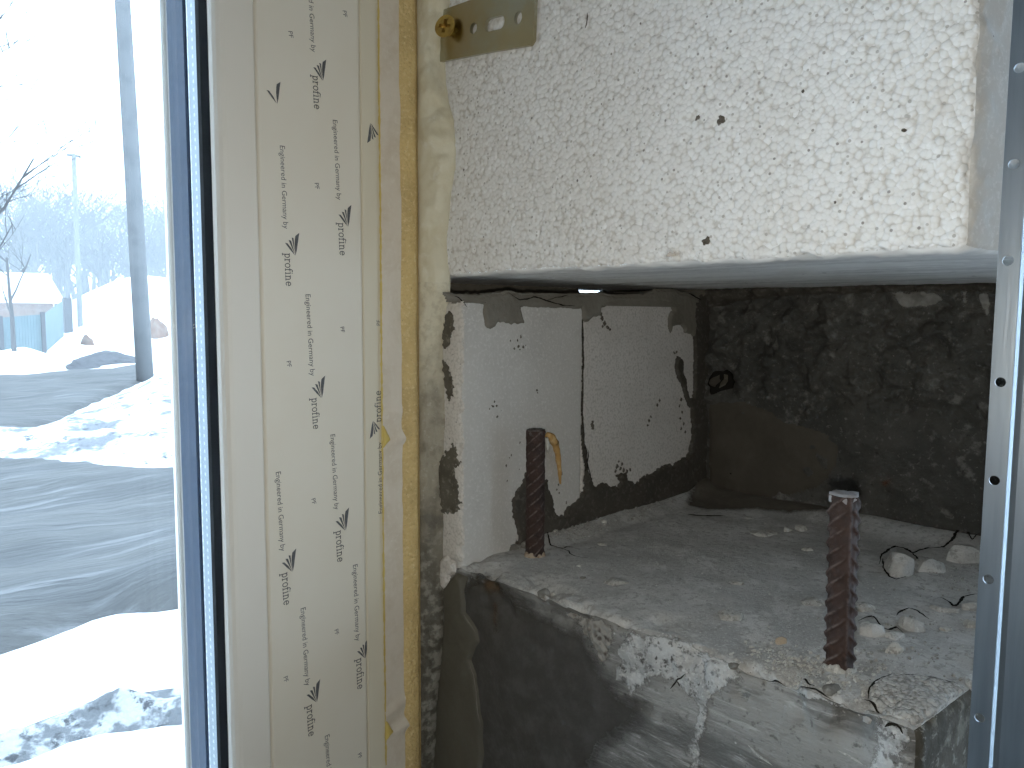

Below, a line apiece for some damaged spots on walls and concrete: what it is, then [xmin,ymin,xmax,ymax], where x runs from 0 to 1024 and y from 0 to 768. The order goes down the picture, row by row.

crack [879,530,979,579]
spalling [773,489,926,709]
crack [860,594,974,631]
spalling [567,612,742,768]
crack [864,674,964,734]
spalling [861,710,910,768]